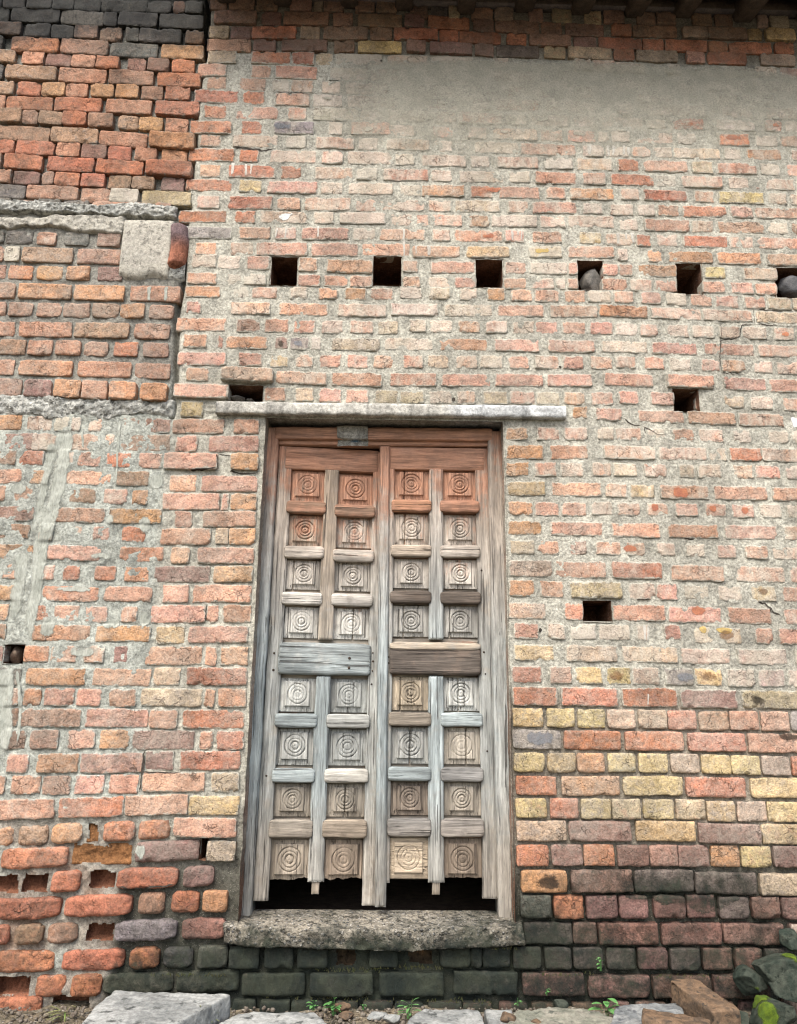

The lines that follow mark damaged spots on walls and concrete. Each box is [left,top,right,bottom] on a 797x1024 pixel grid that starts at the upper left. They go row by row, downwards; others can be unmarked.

spalling [71,823,133,888]
spalling [0,873,49,893]
spalling [85,923,115,941]
spalling [0,976,31,996]